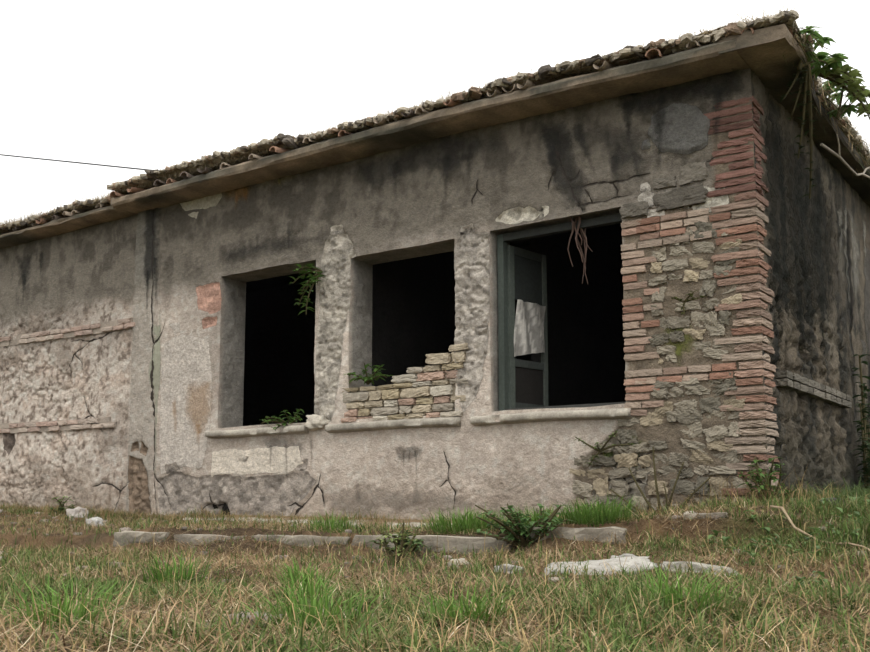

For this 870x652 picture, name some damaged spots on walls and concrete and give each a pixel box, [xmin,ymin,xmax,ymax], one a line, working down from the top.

water stain [144,208,159,296]
spalling [495,205,549,224]
water stain [544,125,585,207]
crack [548,144,650,212]
water stain [766,136,866,343]
crack [69,332,110,376]
crack [150,209,170,504]
peeling [128,282,316,518]
spalling [314,225,356,422]
spalling [454,223,490,412]
crack [288,474,324,515]
crack [440,452,456,509]